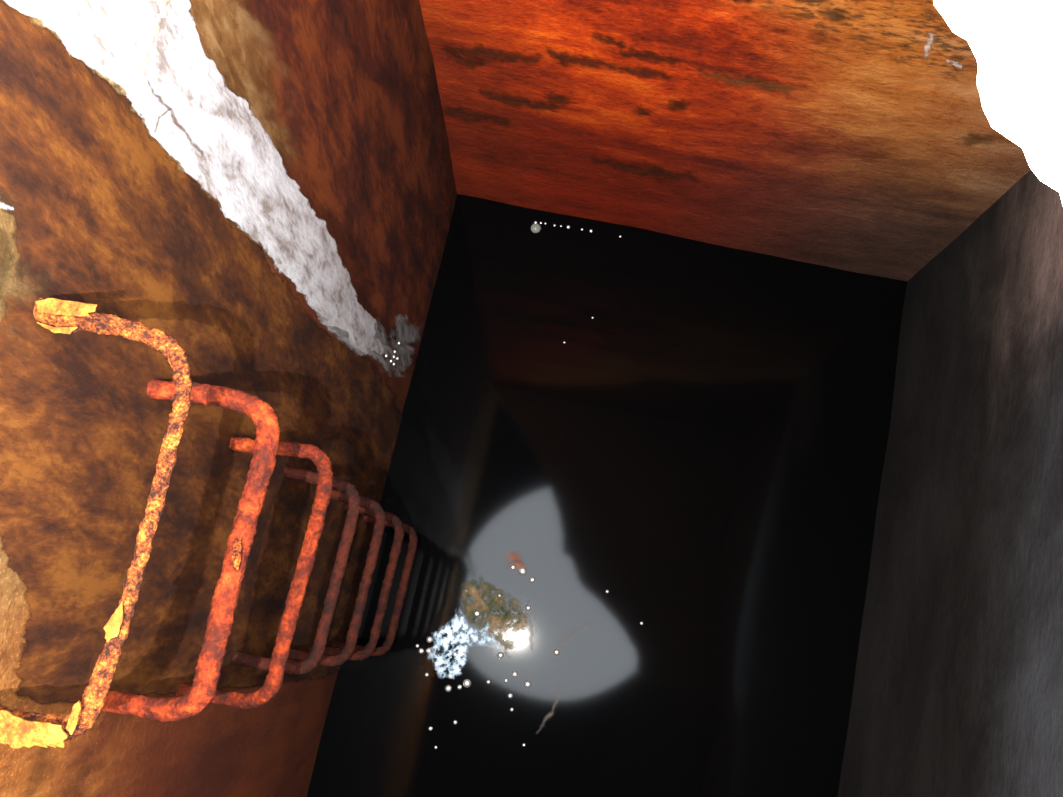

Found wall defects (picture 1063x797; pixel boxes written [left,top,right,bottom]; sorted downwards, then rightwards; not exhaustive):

leakage [698,69,792,91]
leakage [669,101,687,110]
leakage [0,0,679,704]